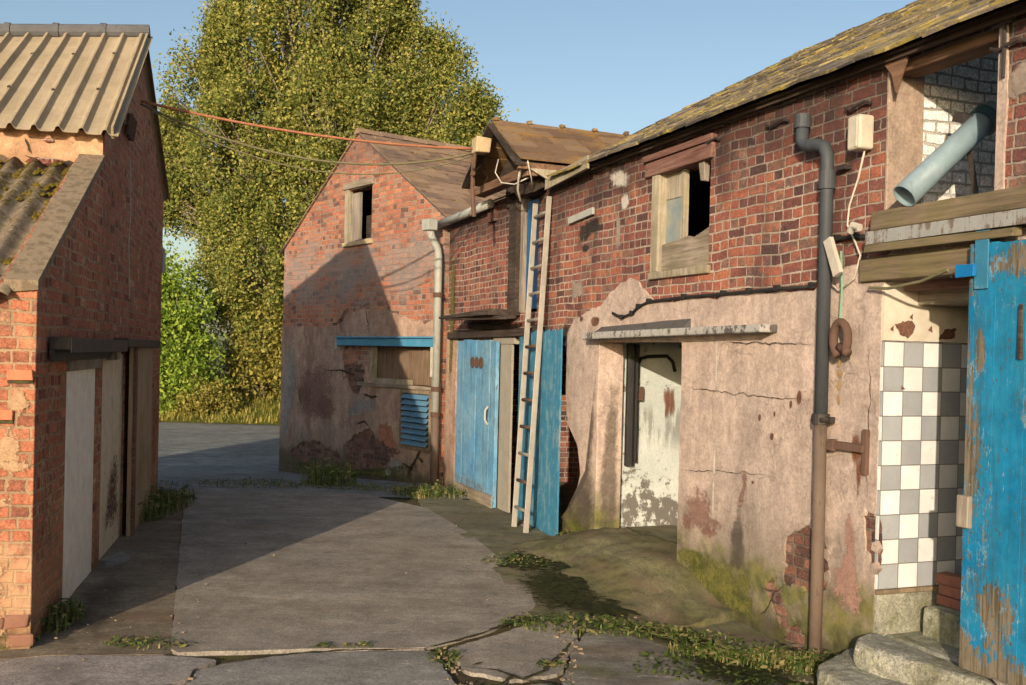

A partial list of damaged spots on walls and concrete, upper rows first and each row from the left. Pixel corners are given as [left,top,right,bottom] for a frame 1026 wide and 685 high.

flaking render [344,360,366,396]
flaking render [291,421,402,475]
flaking render [764,516,812,654]
flaking render [823,501,883,615]
crack [224,594,575,685]